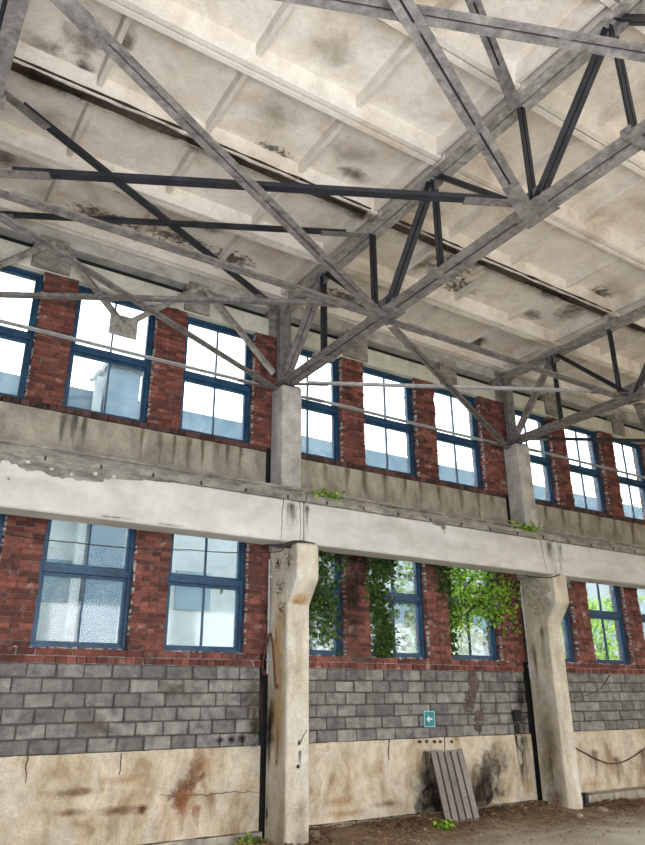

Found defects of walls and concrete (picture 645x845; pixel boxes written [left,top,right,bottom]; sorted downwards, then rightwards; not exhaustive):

peeling [0,454,173,483]
corrosion [172,767,204,809]
crack [161,789,258,797]